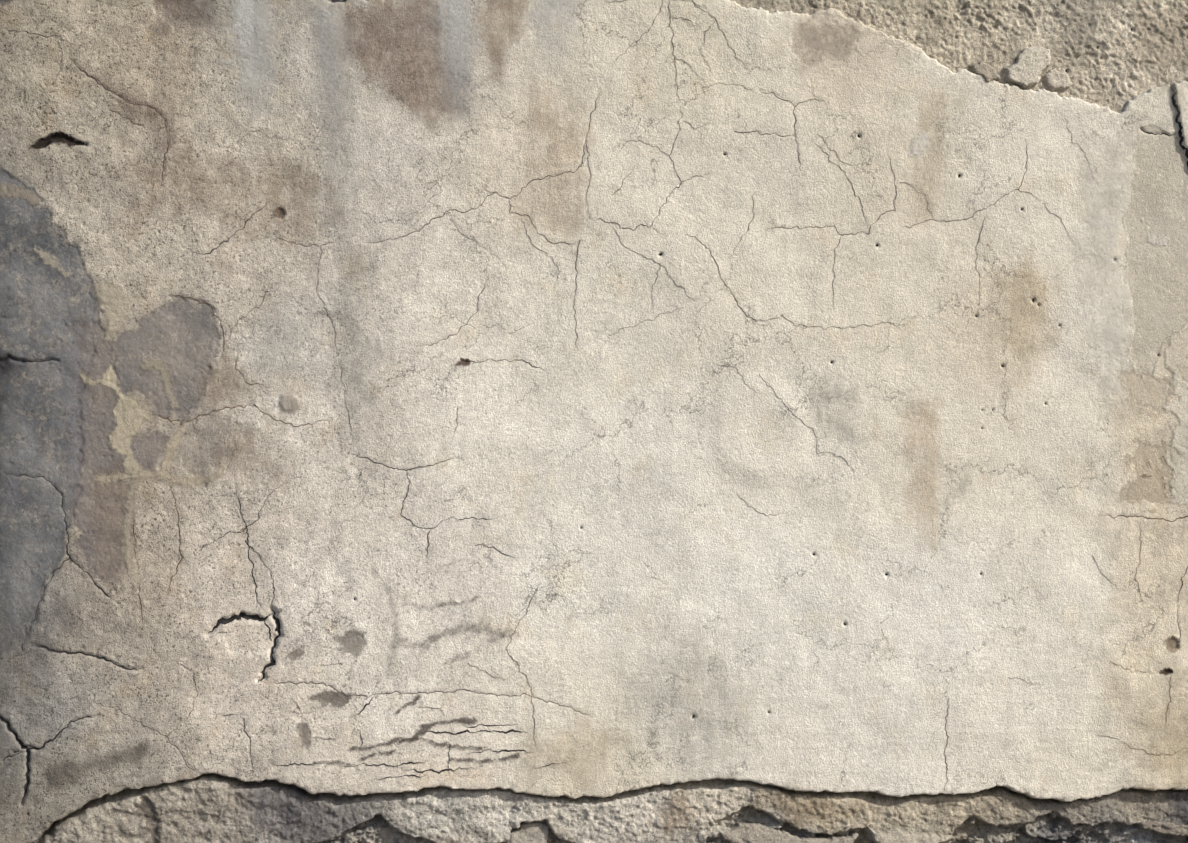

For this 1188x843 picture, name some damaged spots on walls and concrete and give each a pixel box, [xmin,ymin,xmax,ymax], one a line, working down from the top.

crack [8,29,169,187]
leakage [232,0,264,71]
flaking render [729,0,1188,113]
crack [1140,89,1188,167]
crack [192,0,1074,557]
leakage [0,168,170,655]
crack [155,293,321,428]
crack [3,474,286,670]
crack [1092,515,1188,594]
crack [0,665,199,804]
crack [271,588,590,748]
flaking render [34,773,1188,843]